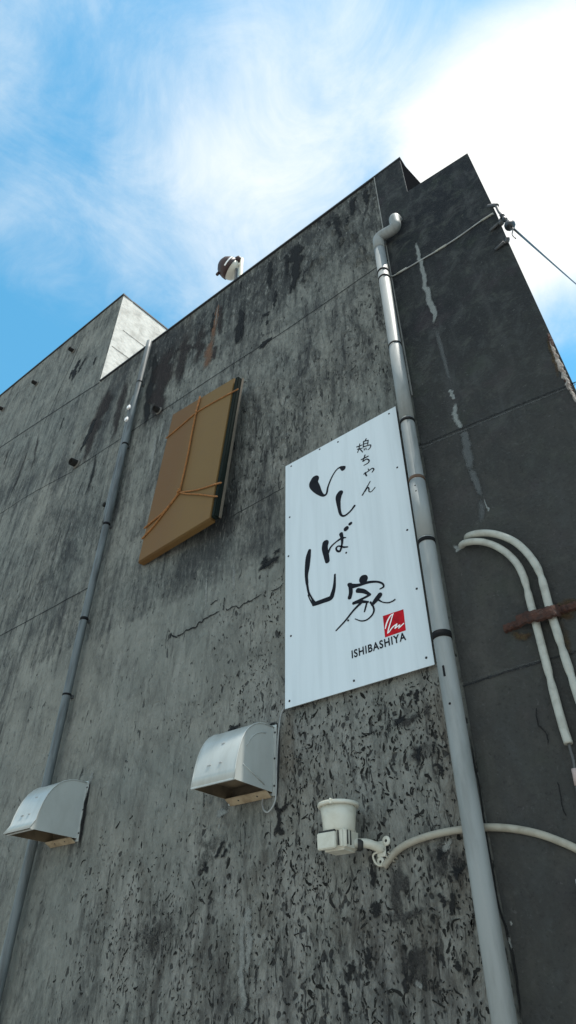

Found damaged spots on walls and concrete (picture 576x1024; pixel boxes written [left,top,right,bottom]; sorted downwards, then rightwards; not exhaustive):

water stain [415,244,490,520]
water stain [80,384,128,492]
crack [169,585,282,639]